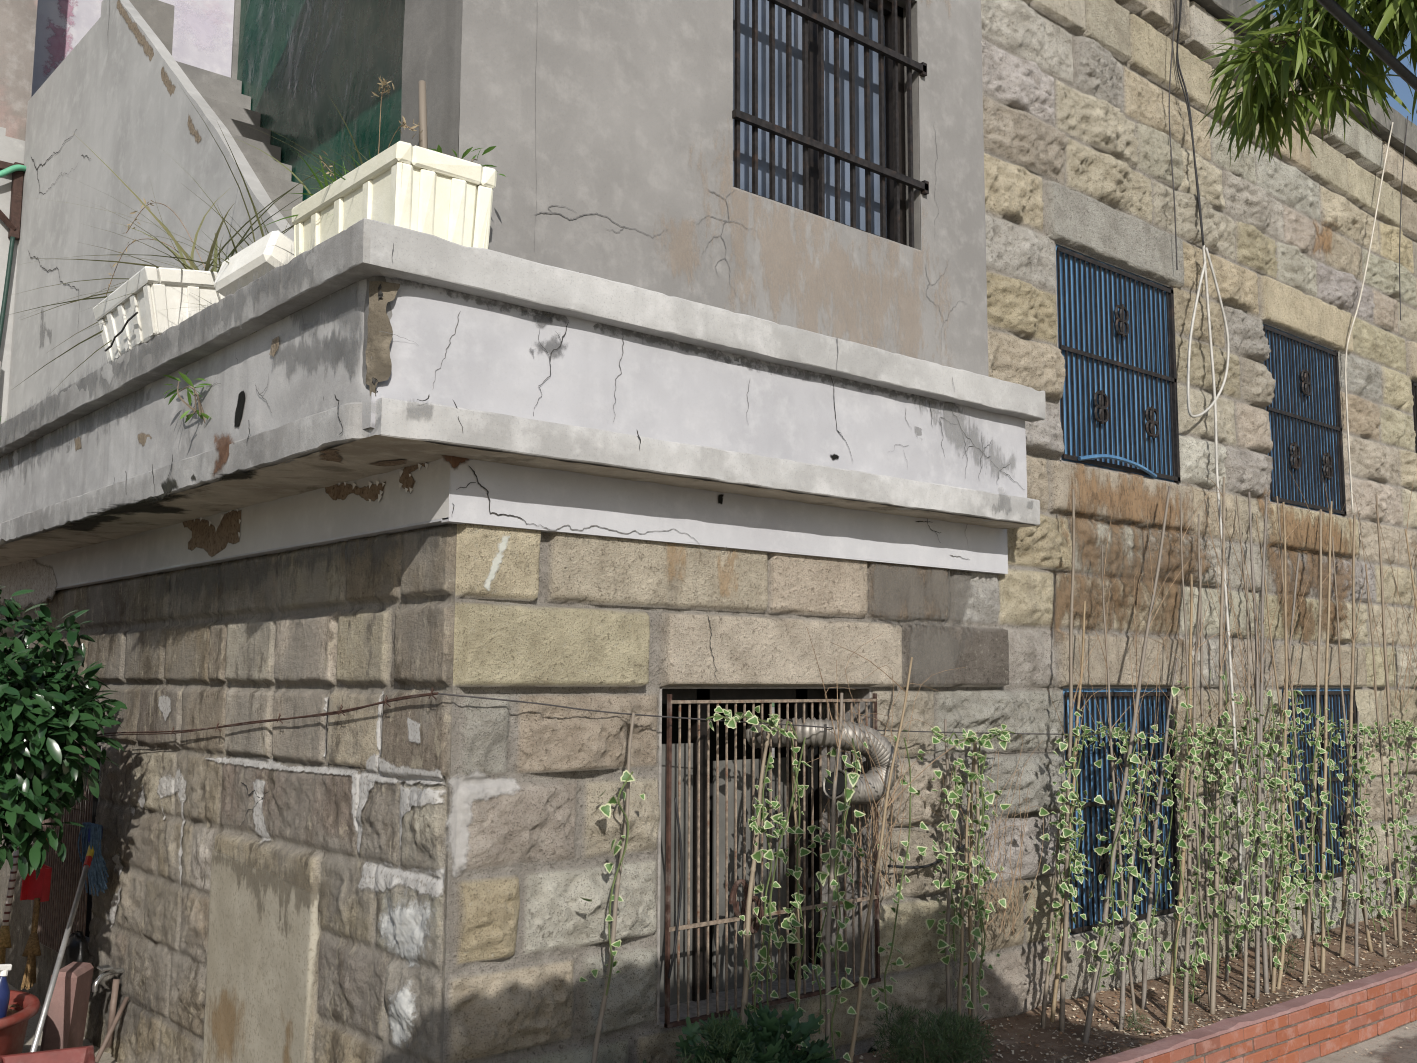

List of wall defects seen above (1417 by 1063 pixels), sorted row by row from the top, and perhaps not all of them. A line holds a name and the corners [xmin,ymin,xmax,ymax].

peeling [44,0,74,74]
crack [31,132,91,194]
crack [535,51,753,296]
spalling [365,281,400,396]
crack [379,311,463,431]
crack [533,322,569,416]
crack [613,336,641,448]
leakage [593,323,958,409]
peeling [183,509,242,557]
peeling [325,460,428,502]
crack [452,466,724,554]
peeling [380,891,431,1046]